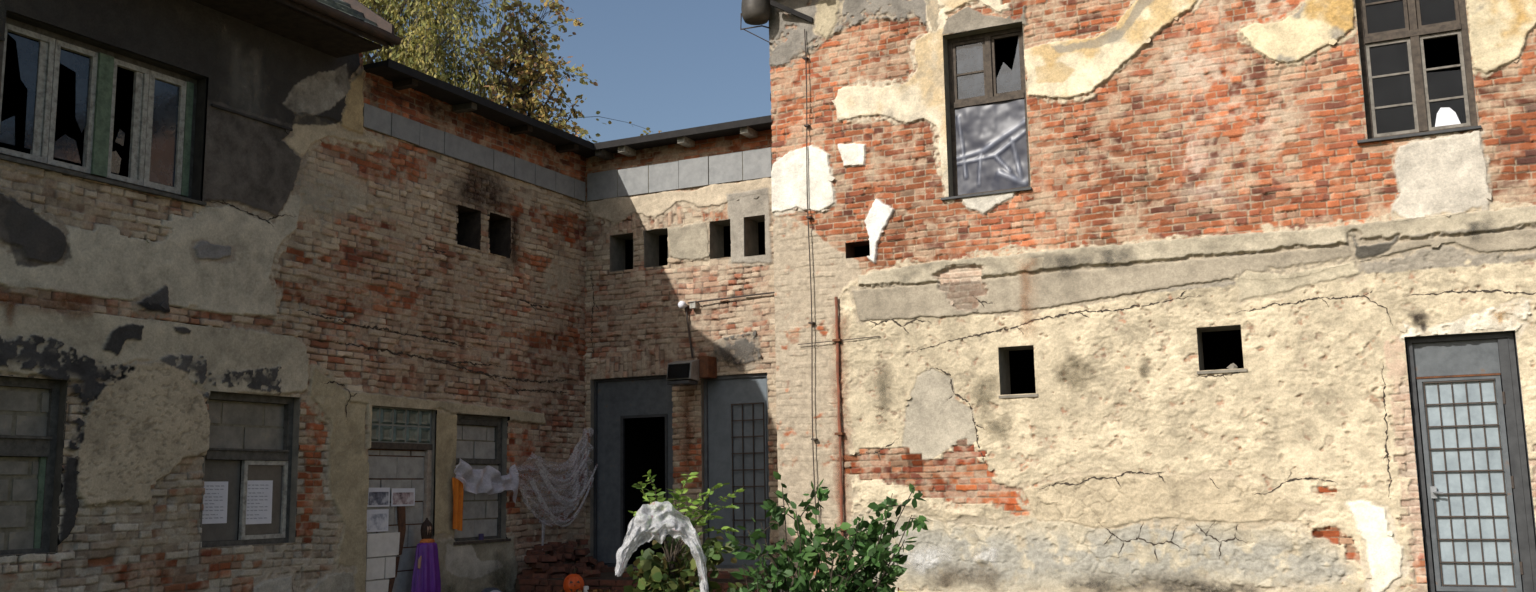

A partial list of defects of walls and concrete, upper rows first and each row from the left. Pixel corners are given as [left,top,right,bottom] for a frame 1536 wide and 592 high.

flaking render [1024,0,1197,98]
flaking render [769,0,1014,197]
spalling [0,160,212,243]
spalling [845,240,870,258]
spalling [842,439,1068,518]
crack [1039,471,1164,490]
crack [1098,474,1338,560]
flaking render [88,548,254,592]